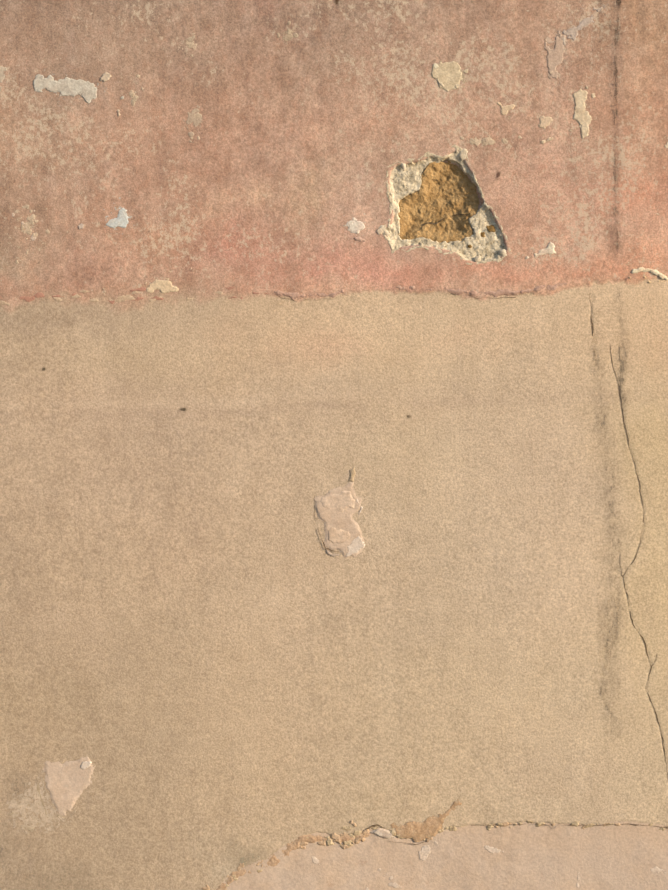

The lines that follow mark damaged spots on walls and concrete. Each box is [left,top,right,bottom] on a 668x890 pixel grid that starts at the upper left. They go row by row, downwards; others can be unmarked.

peeling [33,67,146,118]
peeling [426,54,474,95]
peeling [533,81,600,144]
peeling [540,1,606,85]
spalling [343,96,525,265]
peeling [104,198,135,230]
peeling [525,237,560,267]
peeling [0,270,193,306]
peeling [313,467,365,564]
crack [610,347,668,773]
peeling [3,756,96,834]